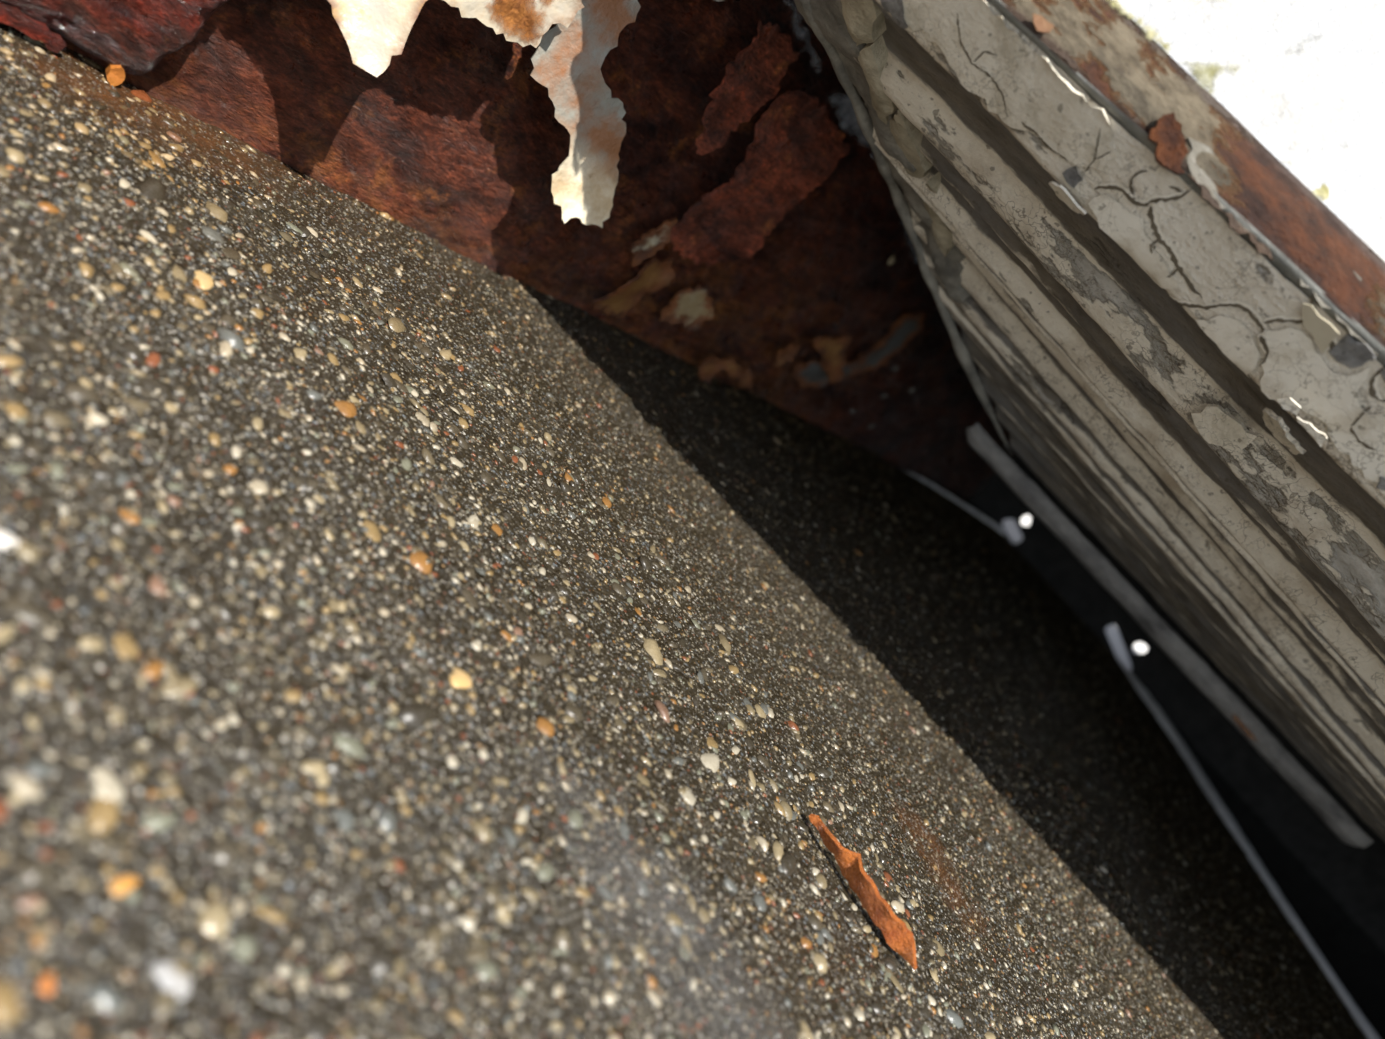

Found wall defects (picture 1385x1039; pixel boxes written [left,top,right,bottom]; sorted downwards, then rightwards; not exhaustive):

rust [0,2,66,53]
peeling [328,0,427,77]
rust [494,0,548,40]
peeling [444,0,641,228]
rust [592,20,851,333]
peeling [873,0,1118,188]
crack [957,13,1314,370]
rust [1147,112,1189,175]
peeling [1087,195,1178,289]
peeling [1191,278,1385,496]
crack [1329,338,1338,350]
crack [1350,366,1385,451]